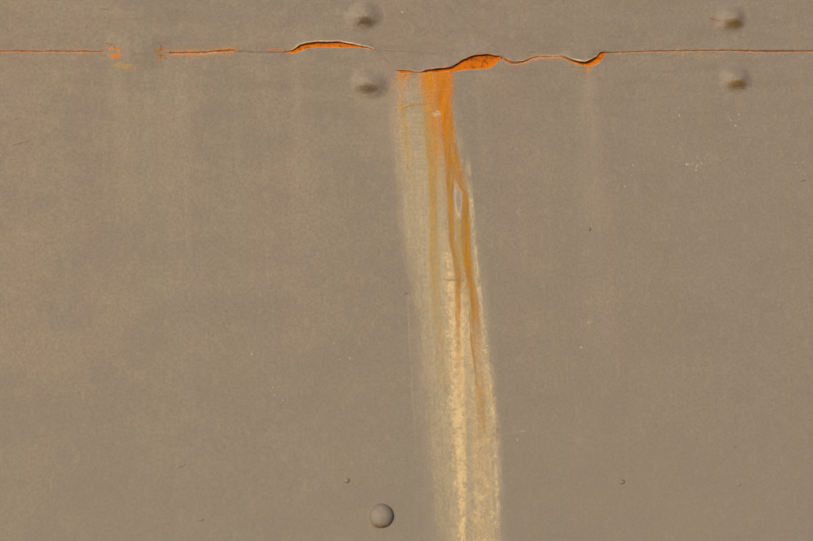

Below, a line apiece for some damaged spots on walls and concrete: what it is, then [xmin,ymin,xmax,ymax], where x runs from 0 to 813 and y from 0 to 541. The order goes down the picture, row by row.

crack [0,48,103,56]
crack [166,47,284,56]
crack [606,47,813,55]
crack [502,56,565,64]
rust [397,71,499,541]